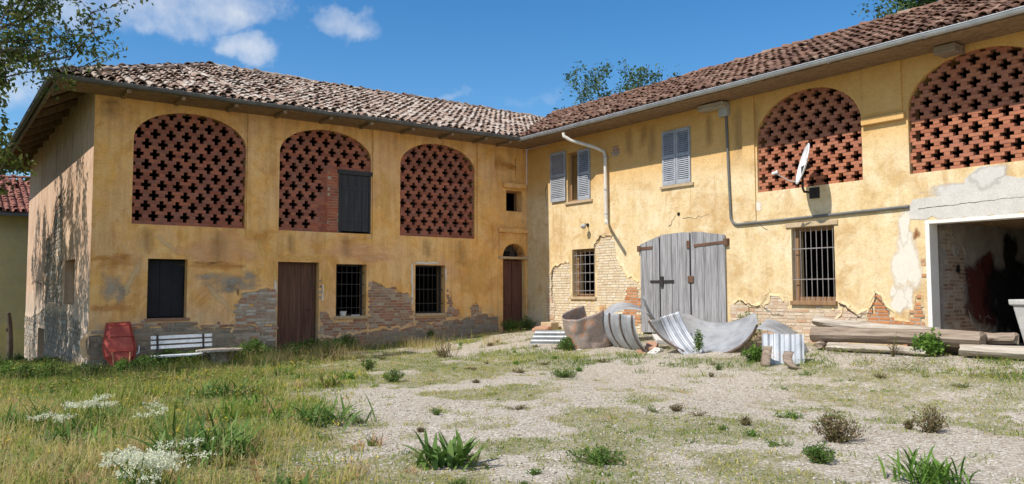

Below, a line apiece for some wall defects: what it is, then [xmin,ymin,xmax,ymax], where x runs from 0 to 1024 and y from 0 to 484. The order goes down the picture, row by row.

peeling [970,165,1006,189]
spalling [131,285,278,360]
spalling [318,277,499,348]
spalling [544,233,641,334]
spalling [730,291,926,343]